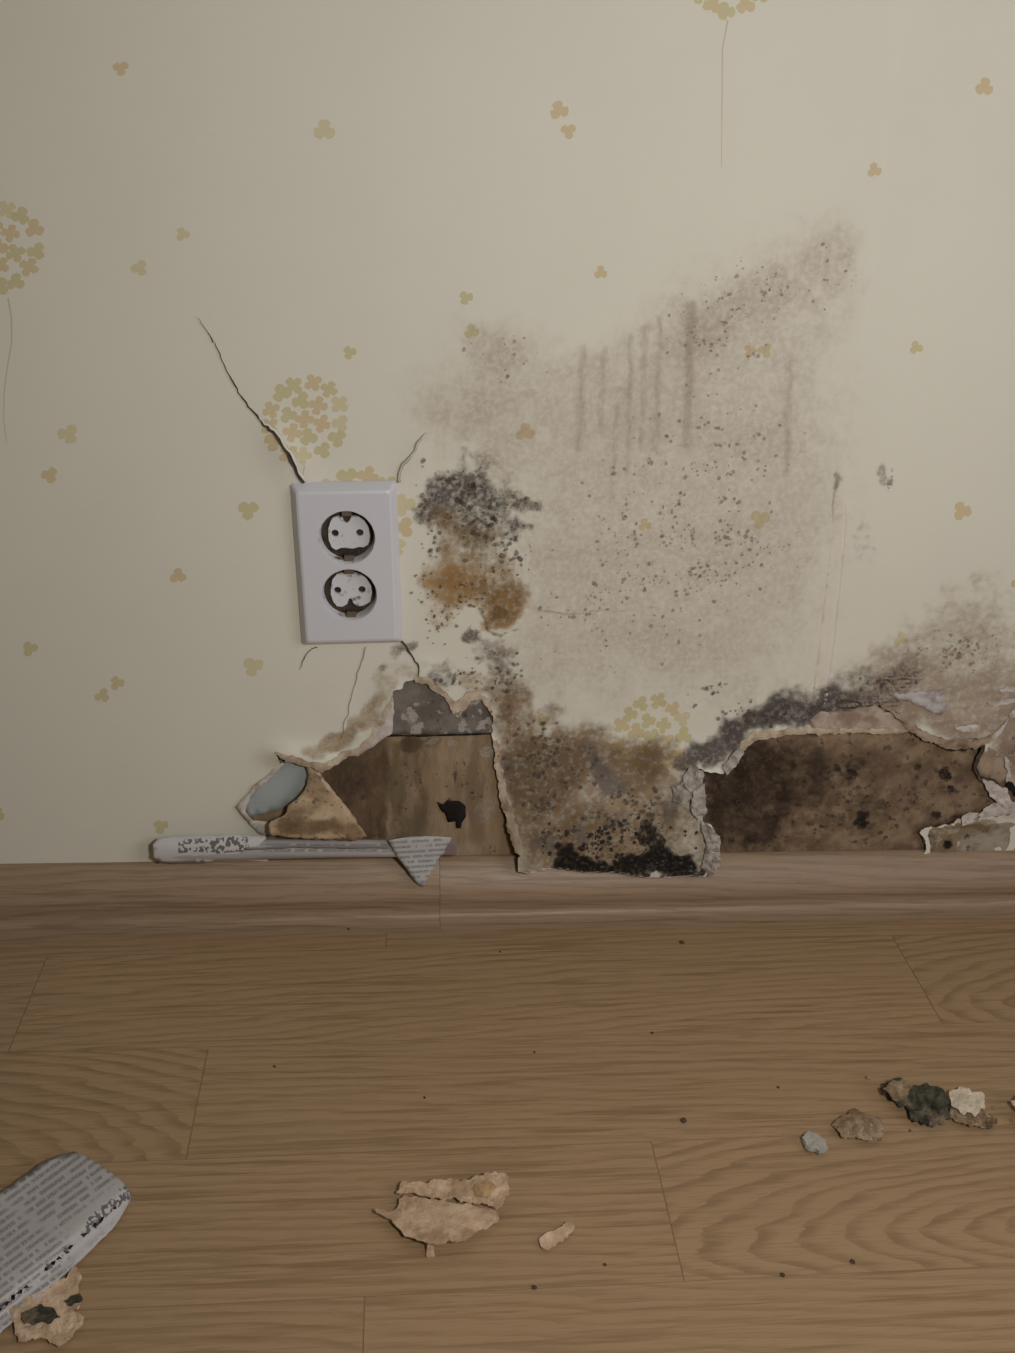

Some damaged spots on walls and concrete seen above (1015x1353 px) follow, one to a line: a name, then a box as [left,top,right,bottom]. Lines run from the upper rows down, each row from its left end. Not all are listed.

crack [199,319,307,484]
leakage [312,697,379,757]
peeling [236,676,523,860]
leakage [398,467,1015,878]
peeling [672,702,1015,876]